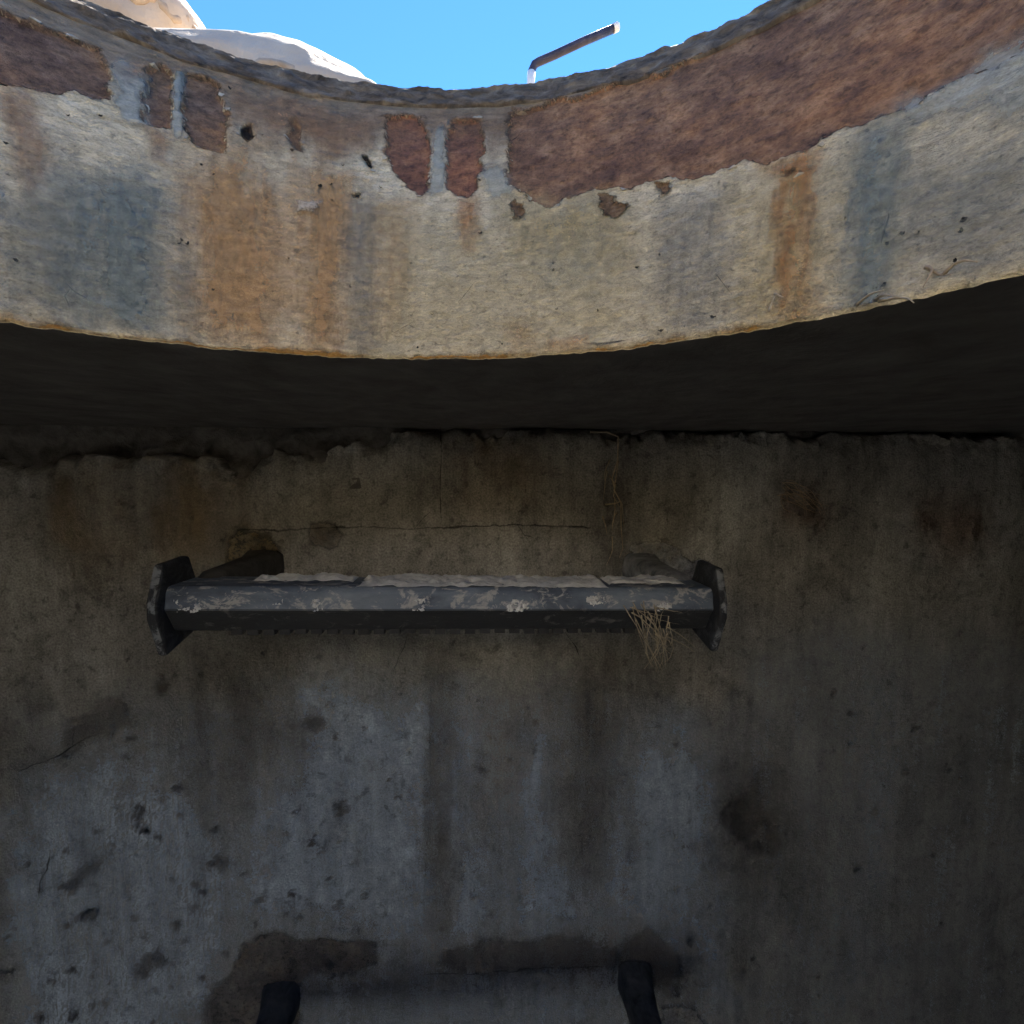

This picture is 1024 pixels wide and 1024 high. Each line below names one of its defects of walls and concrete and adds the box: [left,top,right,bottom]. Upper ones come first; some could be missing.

peeling [0,8,116,100]
peeling [139,62,254,154]
peeling [362,113,486,198]
peeling [505,0,1024,221]